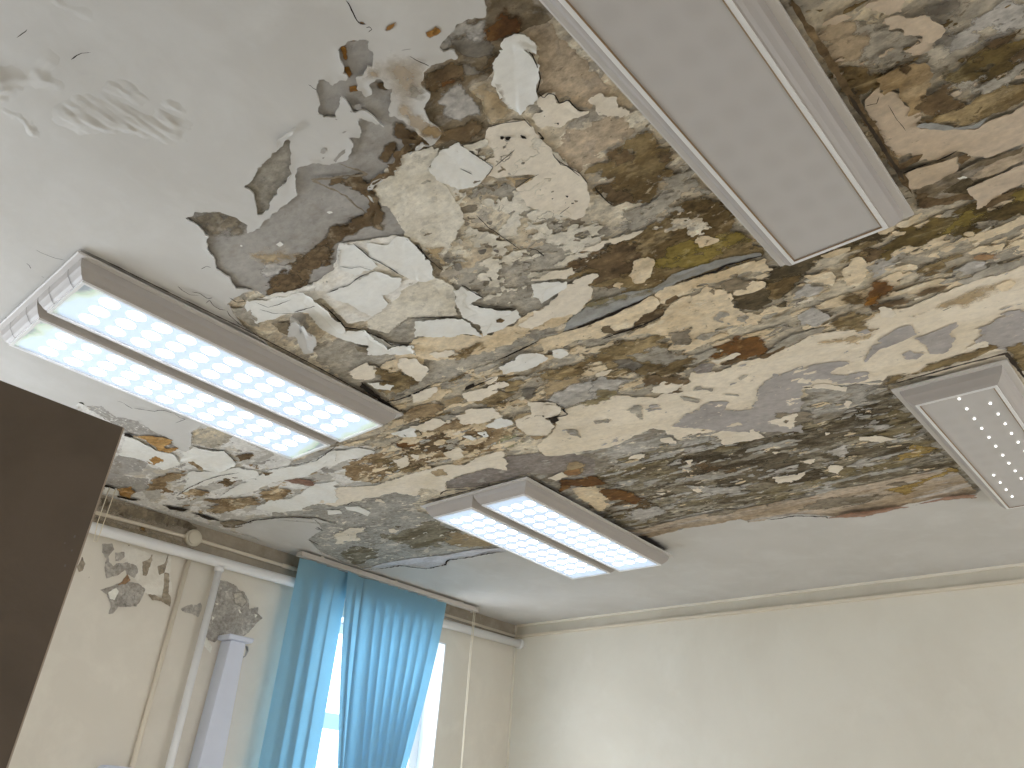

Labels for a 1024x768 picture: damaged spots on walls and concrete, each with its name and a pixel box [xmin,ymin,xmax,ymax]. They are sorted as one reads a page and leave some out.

leakage [806,0,1024,131]
crack [387,385,430,402]
peeling [76,0,1024,653]
crack [462,256,773,392]
leakage [565,123,764,301]
leakage [537,187,1024,406]